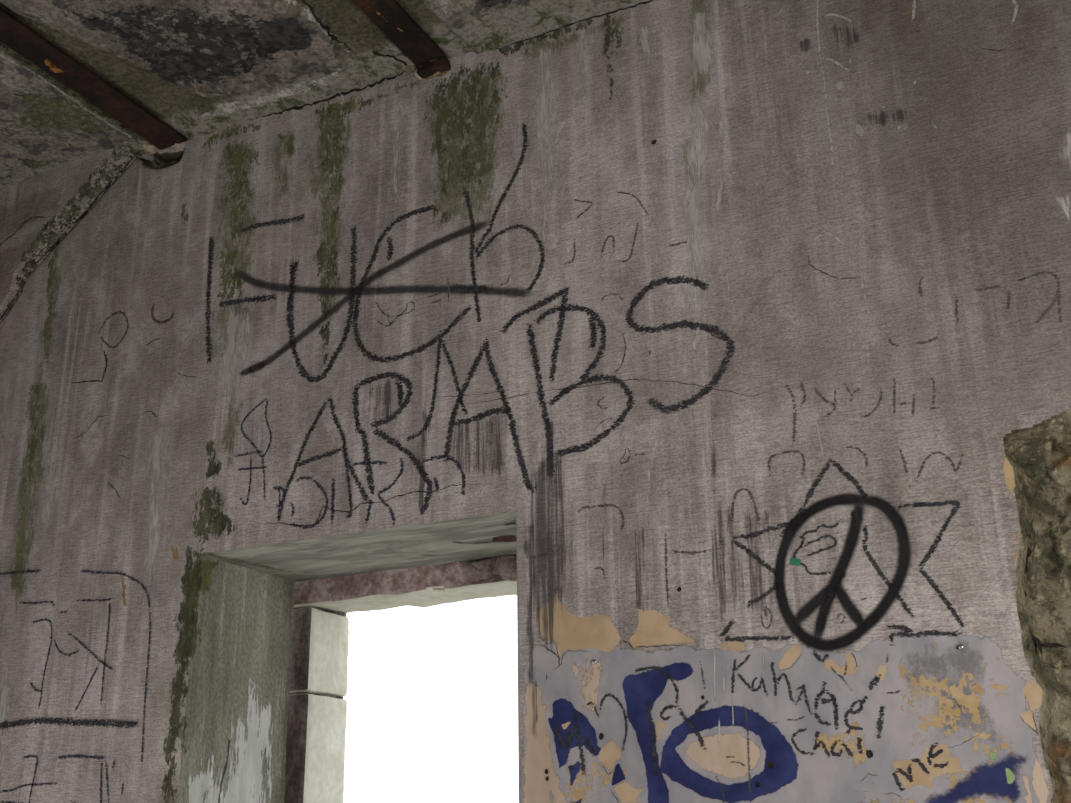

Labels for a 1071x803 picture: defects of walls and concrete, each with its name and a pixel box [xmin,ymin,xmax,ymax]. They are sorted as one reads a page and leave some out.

leakage [424,14,624,243]
crack [0,152,139,320]
crack [69,351,108,383]
leakage [319,318,332,366]
leakage [143,426,166,582]
leakage [159,309,250,803]
peeling [519,408,1071,803]